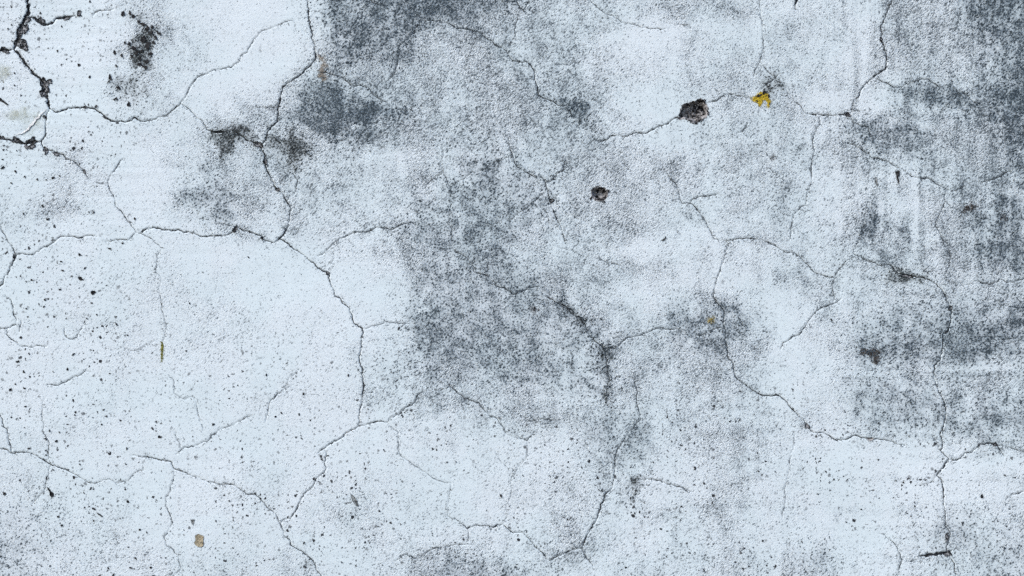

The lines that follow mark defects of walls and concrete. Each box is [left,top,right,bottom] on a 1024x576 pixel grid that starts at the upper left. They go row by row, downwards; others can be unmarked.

crack [0,0,691,575]
leakage [173,0,536,232]
leakage [347,114,680,500]
leakage [543,90,603,138]
spalling [589,186,610,203]
spalling [677,98,709,124]
leakage [652,290,771,369]
crack [426,0,1024,575]
leakage [825,0,1024,452]